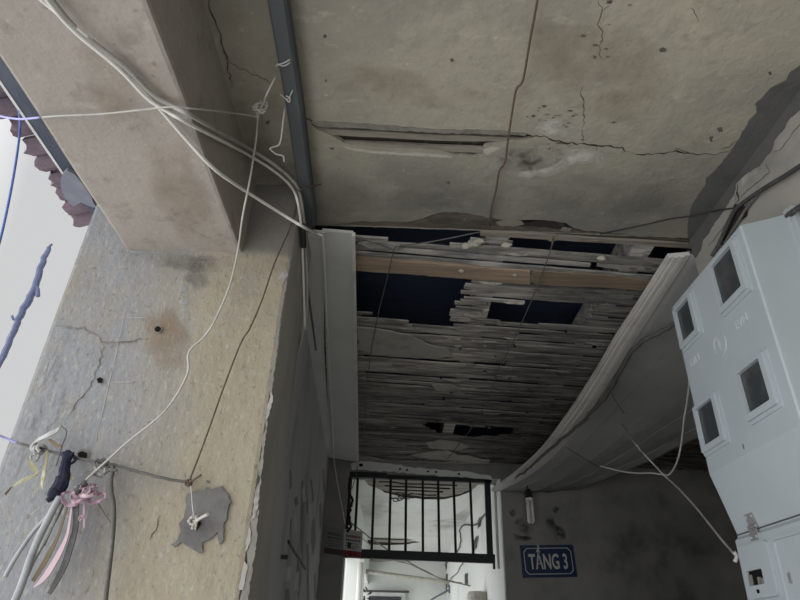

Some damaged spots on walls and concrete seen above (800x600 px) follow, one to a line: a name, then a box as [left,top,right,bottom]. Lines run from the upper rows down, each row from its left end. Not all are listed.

crack [208,0,275,86]
crack [597,2,612,59]
flaking render [311,121,531,158]
leakage [489,149,599,178]
crack [527,86,738,156]
crack [58,325,147,418]